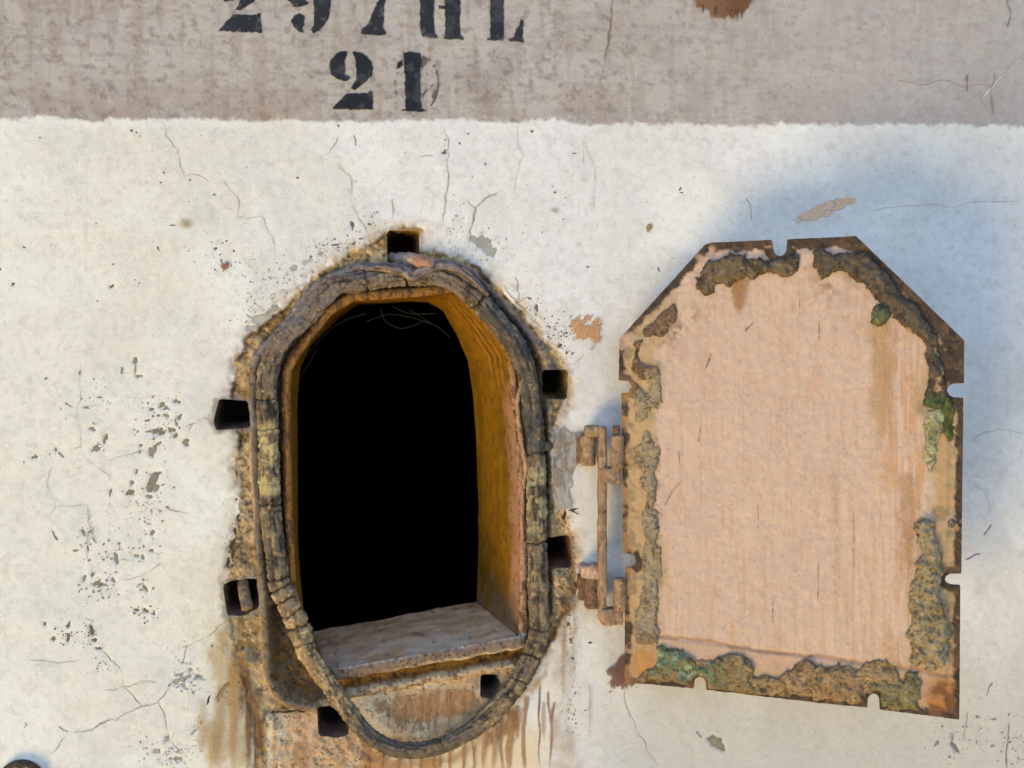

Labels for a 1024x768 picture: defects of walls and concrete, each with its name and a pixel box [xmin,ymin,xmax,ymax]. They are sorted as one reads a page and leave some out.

corrosion [696,0,752,20]
crack [161,120,275,251]
crack [443,125,523,242]
peeling [515,297,602,364]
crack [46,363,146,576]
peeling [73,392,189,624]
peeling [44,618,111,673]
crack [52,651,178,753]
corrosion [200,626,264,764]
corrosion [365,670,555,768]
corrosion [606,655,637,693]